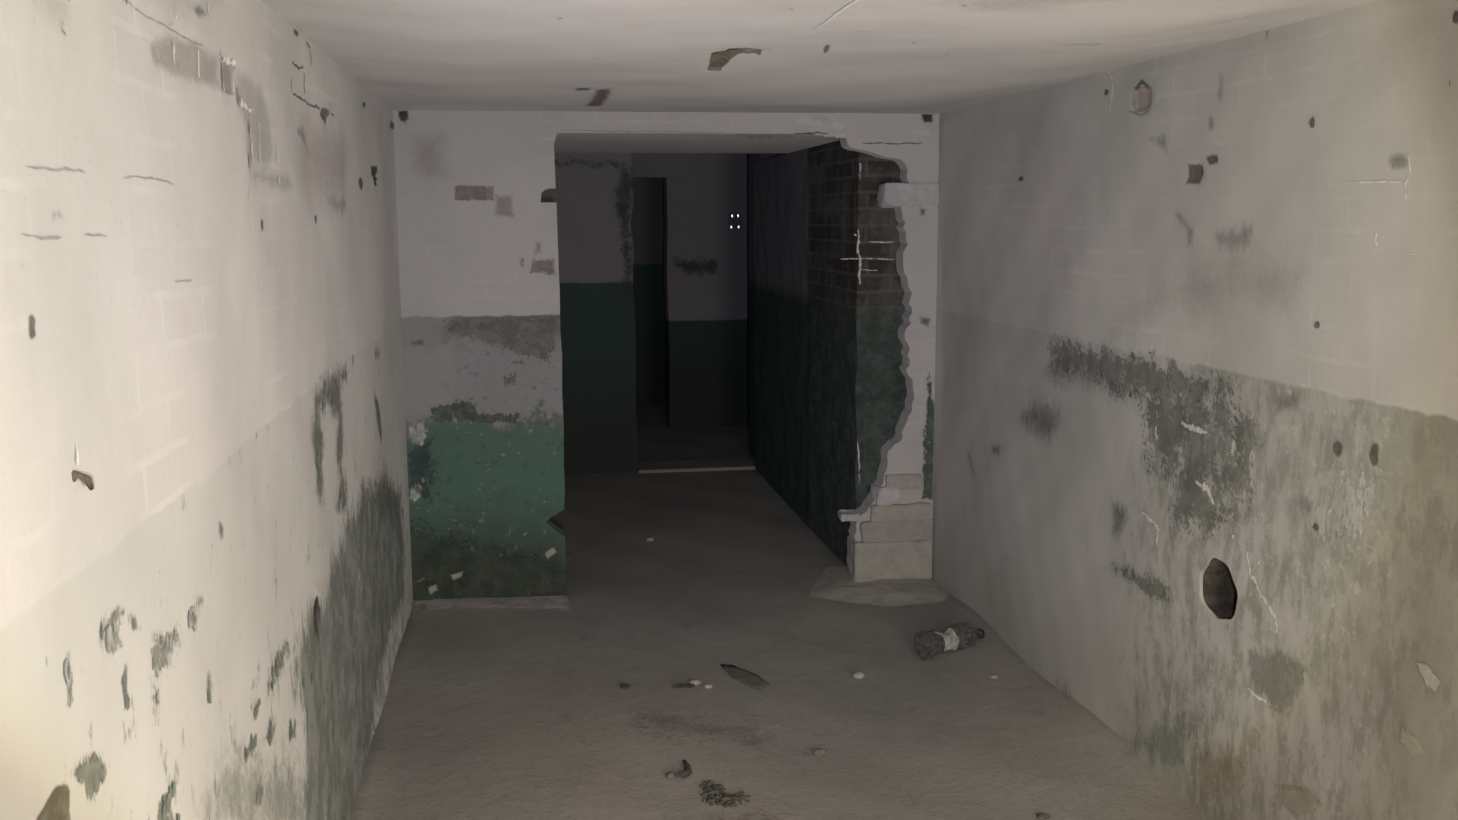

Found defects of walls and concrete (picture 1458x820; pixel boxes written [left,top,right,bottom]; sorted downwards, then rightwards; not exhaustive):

spalling [708,48,762,71]
flaking render [221,54,294,205]
spalling [878,183,939,208]
peeling [1047,334,1265,619]
peeling [65,653,73,707]
peeling [98,599,203,714]
spalling [38,751,106,820]
peeling [158,781,180,820]